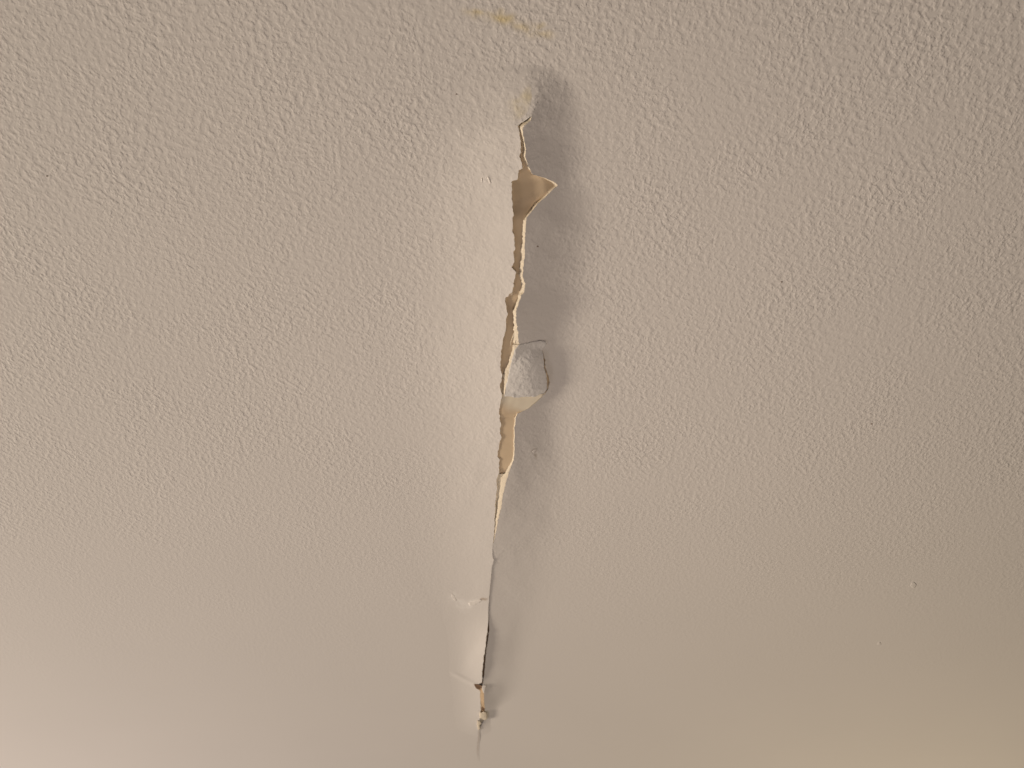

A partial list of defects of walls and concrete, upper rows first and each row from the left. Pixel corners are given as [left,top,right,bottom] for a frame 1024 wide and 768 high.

crack [480,549,494,683]